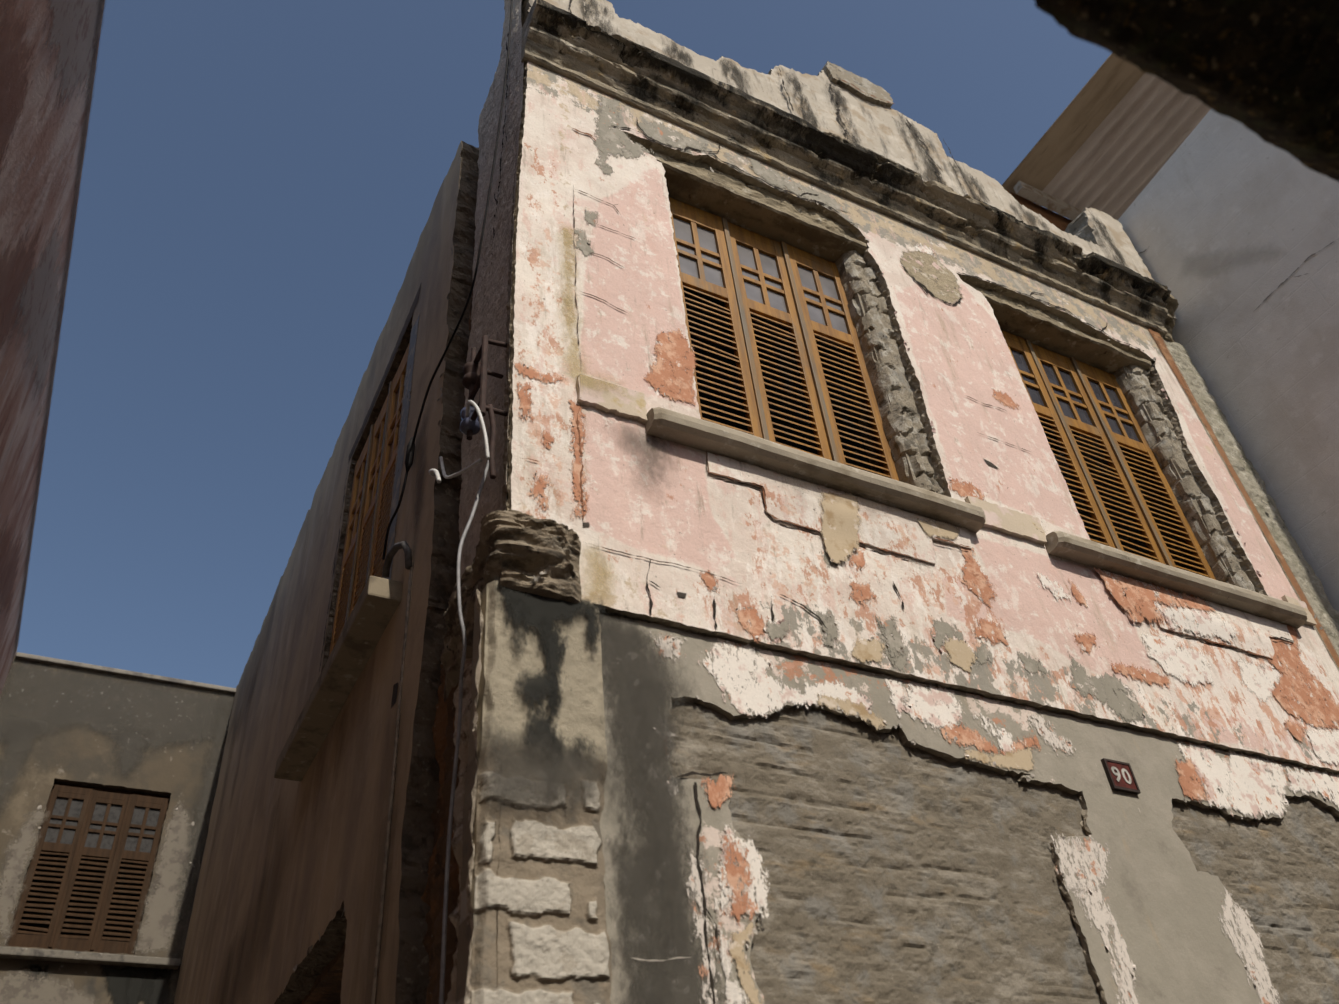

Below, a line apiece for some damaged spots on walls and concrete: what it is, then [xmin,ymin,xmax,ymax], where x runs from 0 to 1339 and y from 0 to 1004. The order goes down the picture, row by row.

damp [0,0,234,1004]
spalling [421,0,590,1004]
peeling [573,209,599,257]
damp [492,580,721,1004]
spalling [593,95,984,500]
damp [536,0,1169,318]
spalling [649,491,1141,1004]
peeling [917,518,1236,724]
spalling [900,243,1339,671]
spalling [1171,617,1339,1004]